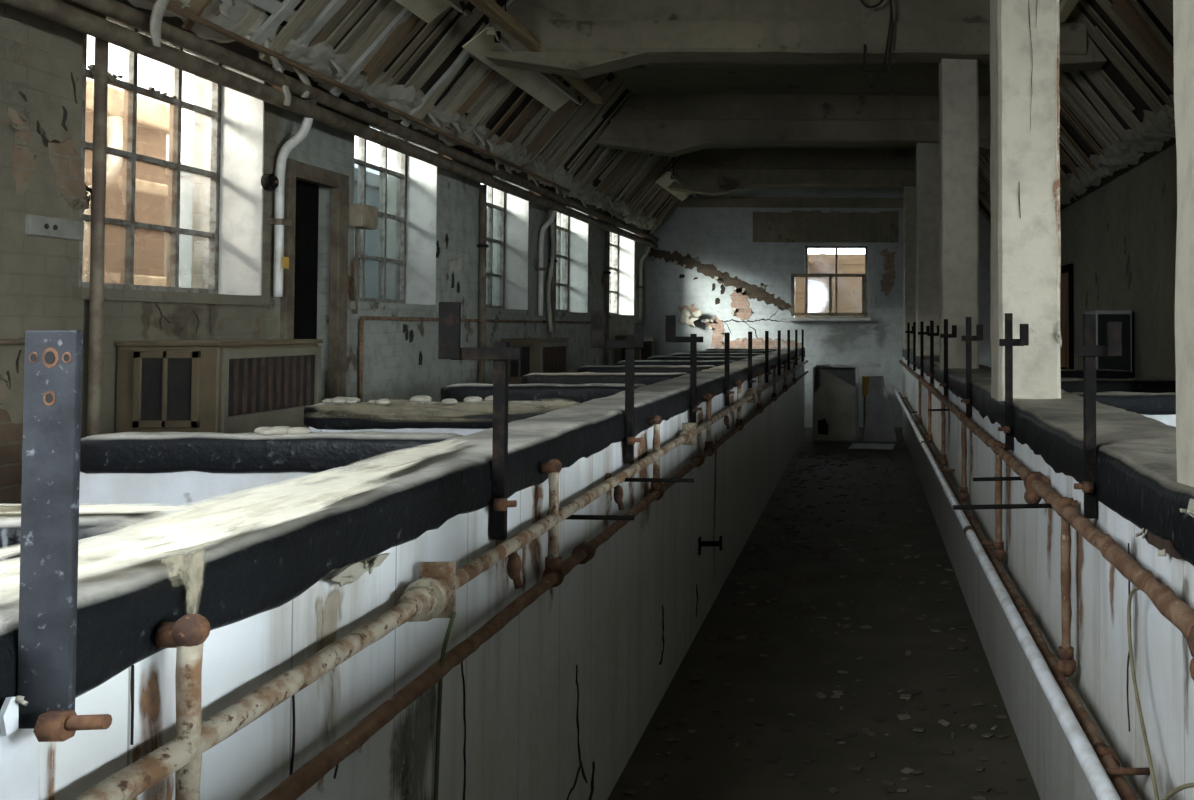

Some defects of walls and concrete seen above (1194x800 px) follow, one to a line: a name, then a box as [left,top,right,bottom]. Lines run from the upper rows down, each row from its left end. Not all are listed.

flaking render [128,0,658,234]
flaking render [47,137,92,212]
flaking render [647,248,802,349]
flaking render [0,402,23,509]
rust [132,670,162,763]